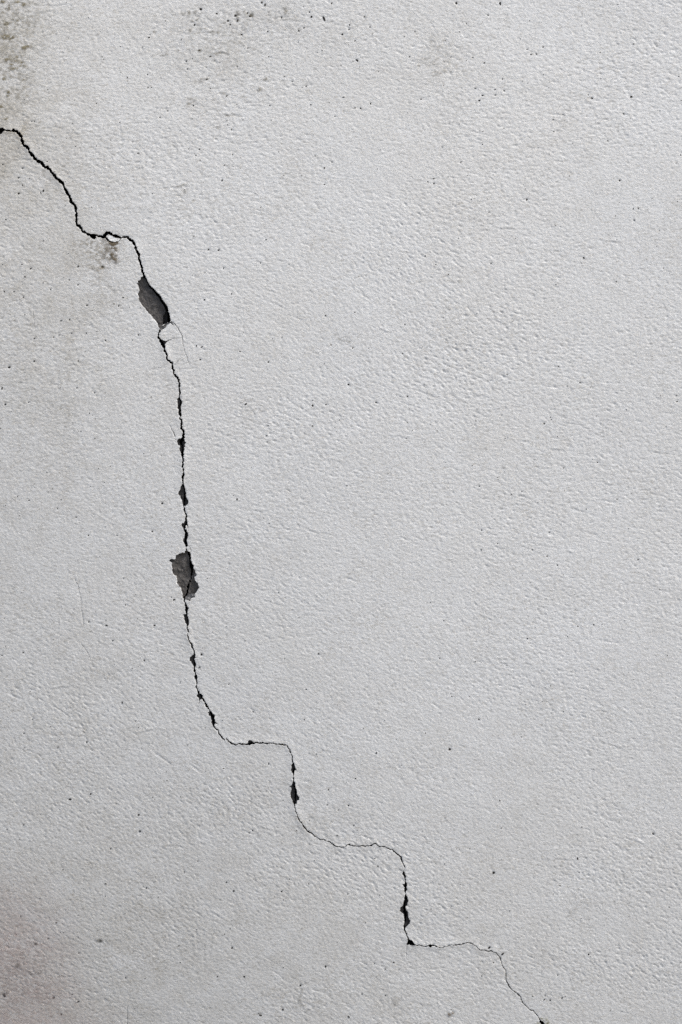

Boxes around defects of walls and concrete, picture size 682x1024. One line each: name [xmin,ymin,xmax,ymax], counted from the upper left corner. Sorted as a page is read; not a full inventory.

spalling [137,277,174,347]
spalling [169,521,199,625]
crack [0,128,544,1024]